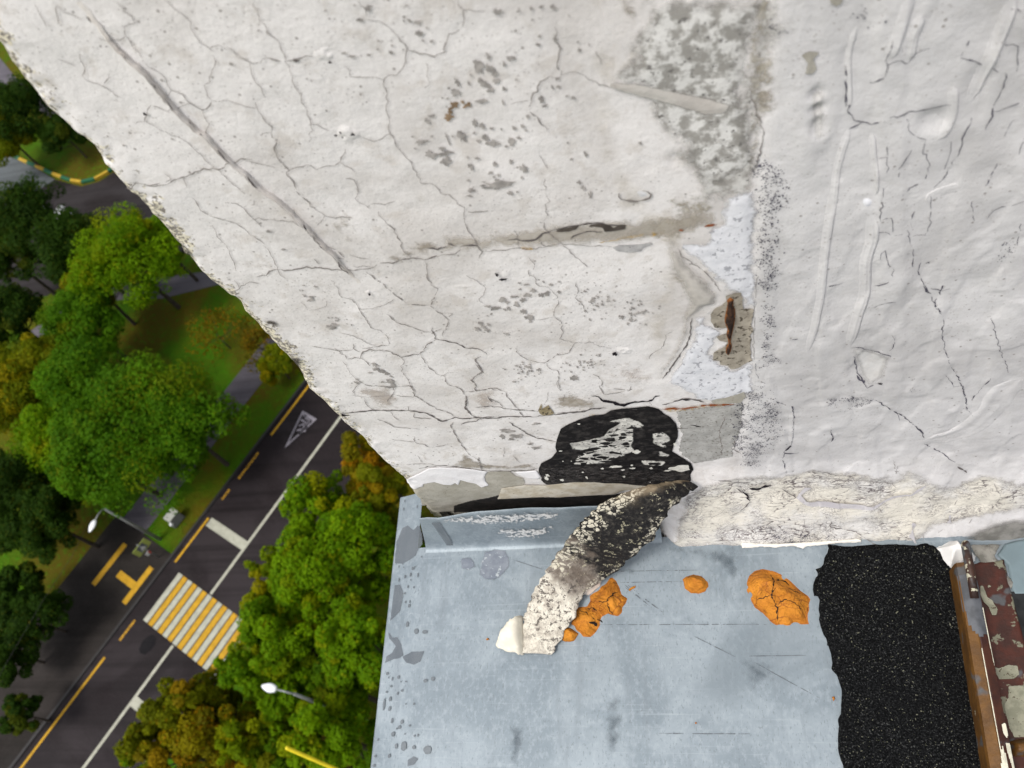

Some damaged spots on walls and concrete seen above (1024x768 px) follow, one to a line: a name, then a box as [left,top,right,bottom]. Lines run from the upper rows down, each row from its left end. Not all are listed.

damp [751,0,788,127]
crack [750,97,764,174]
crack [99,1,739,472]
peeling [556,2,778,479]
crack [844,41,1024,409]
peeling [414,471,525,517]
crack [689,402,898,518]
crack [804,513,874,544]
crack [853,343,967,473]